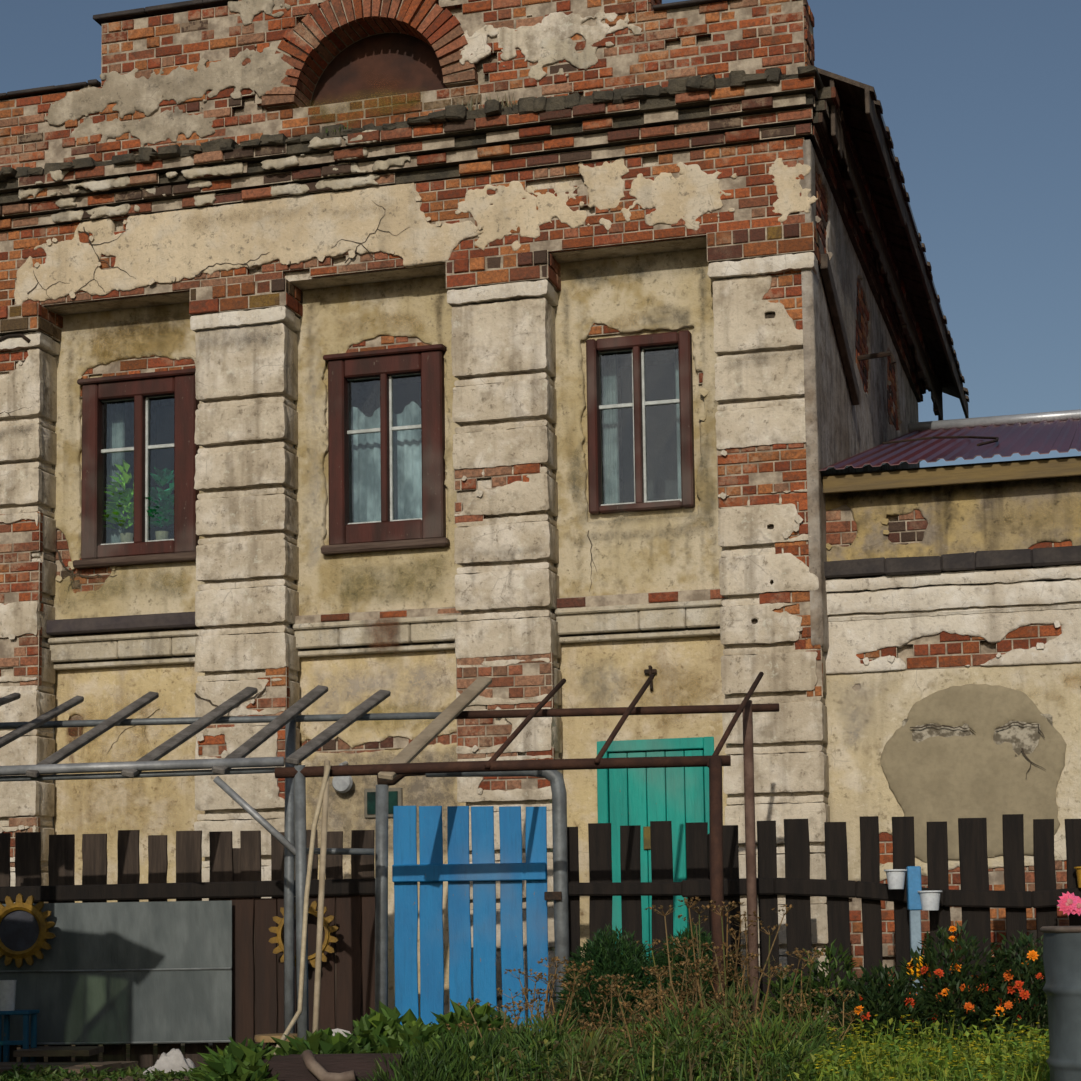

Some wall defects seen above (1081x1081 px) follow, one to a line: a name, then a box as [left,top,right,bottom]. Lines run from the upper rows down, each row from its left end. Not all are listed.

crack [27,227,136,300]
peeling [0,222,406,307]
crack [332,203,409,263]
flaking render [414,137,833,263]
flaking render [758,270,803,330]
flaking render [454,463,542,524]
flaking render [717,443,809,567]
flaking render [0,511,117,612]
flaking render [759,591,823,697]
flaking render [856,620,1062,670]
crack [194,689,266,716]
flaking render [429,651,555,760]